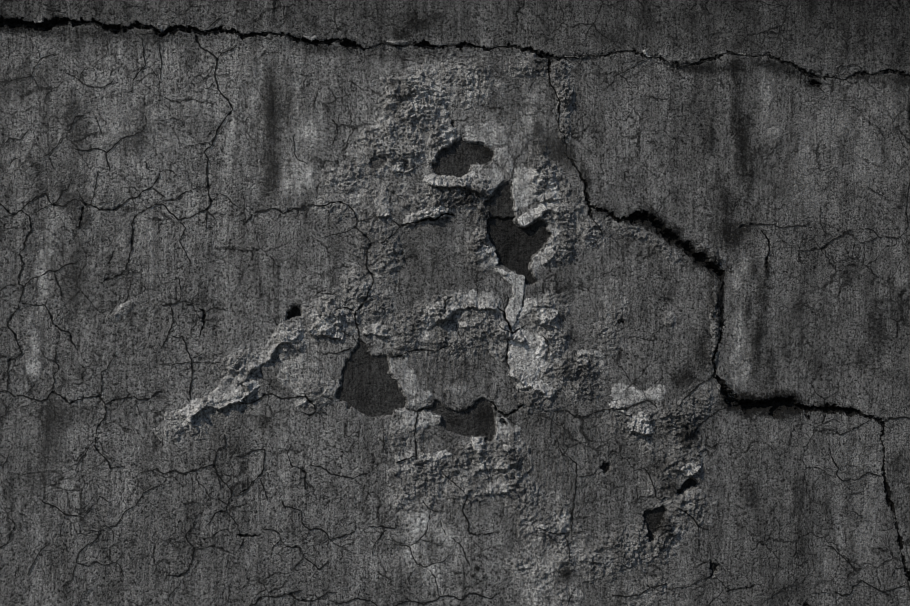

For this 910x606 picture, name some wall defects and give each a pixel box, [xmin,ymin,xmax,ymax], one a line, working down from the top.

crack [27,406,499,606]
flaking render [152,51,734,606]
crack [0,12,910,469]
crack [490,389,715,564]
crack [559,130,910,598]